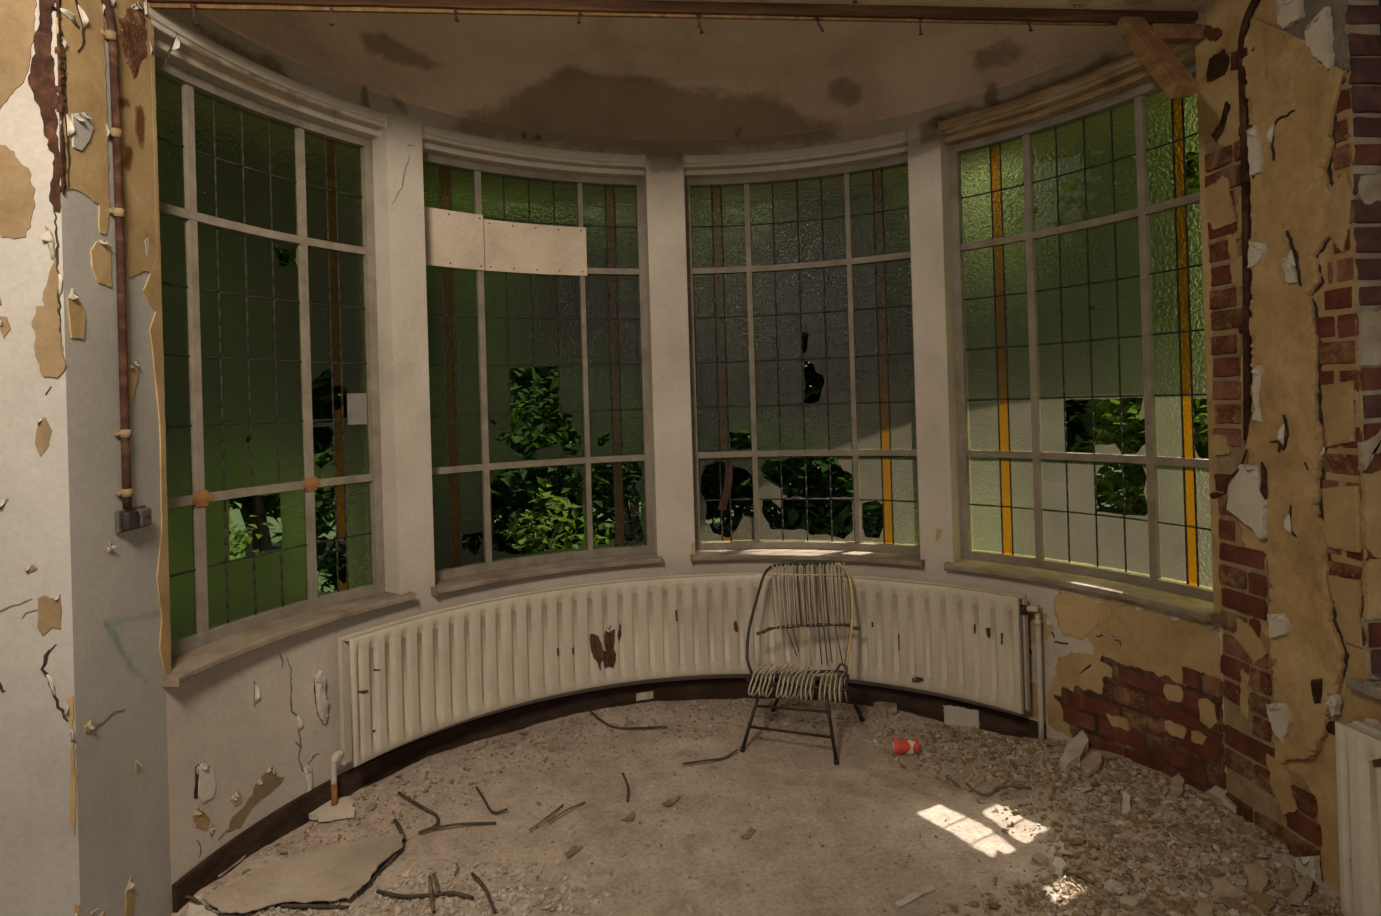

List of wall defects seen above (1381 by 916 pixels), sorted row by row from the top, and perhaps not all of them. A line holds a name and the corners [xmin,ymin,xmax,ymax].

peeling [0,0,172,675]
flaking render [1276,0,1381,680]
flaking render [1022,125,1323,885]
crack [0,599,37,619]
crack [40,644,125,726]
corrosion [590,626,616,670]
peeling [1311,679,1342,717]
peeling [192,763,284,840]